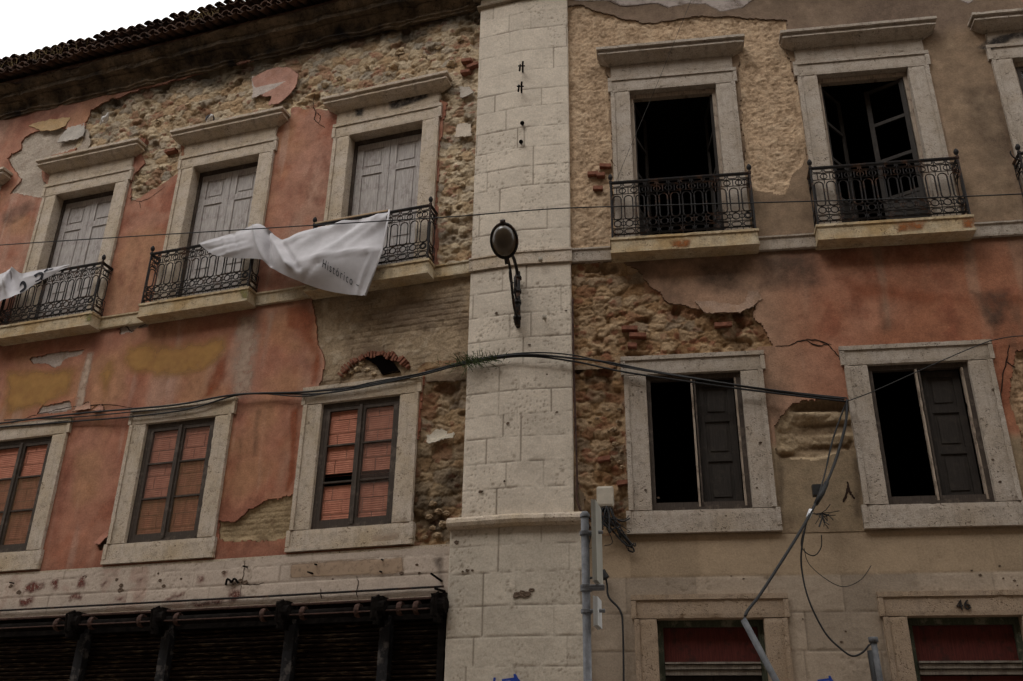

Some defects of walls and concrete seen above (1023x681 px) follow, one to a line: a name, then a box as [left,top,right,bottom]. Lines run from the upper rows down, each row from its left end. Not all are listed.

peeling [251,76,285,99]
peeling [458,86,474,98]
peeling [454,123,472,138]
flaking render [568,0,806,248]
flaking render [9,117,91,198]
flaking render [1009,350,1023,451]
peeling [426,429,455,444]
flaking render [774,400,855,461]
flaking render [219,495,293,542]